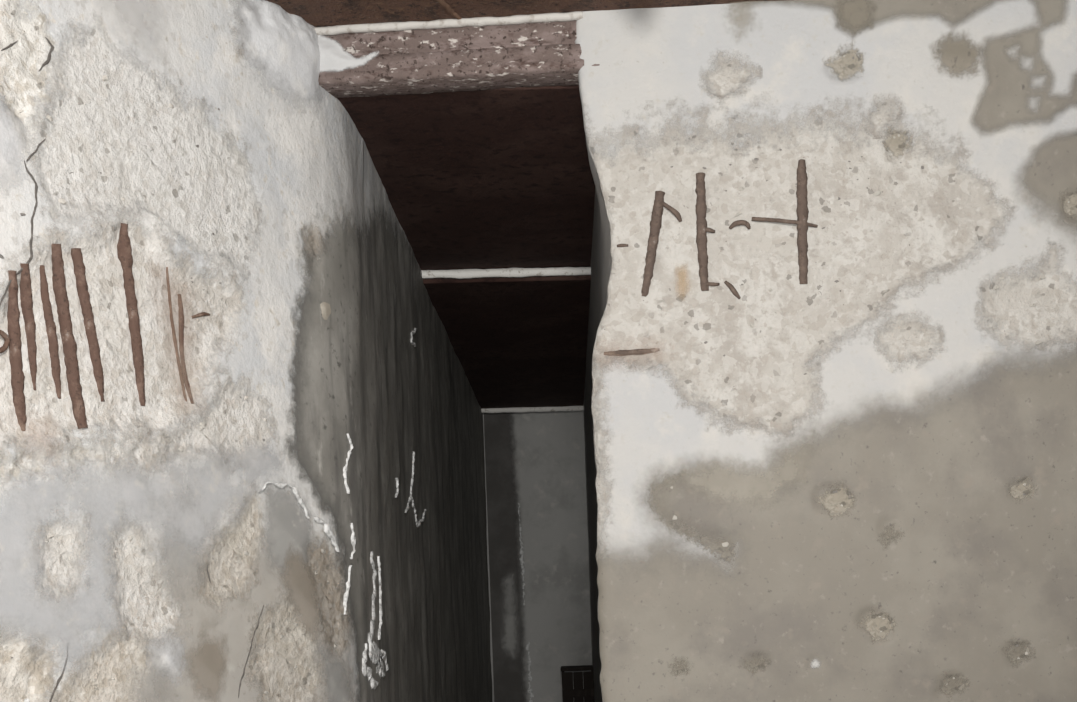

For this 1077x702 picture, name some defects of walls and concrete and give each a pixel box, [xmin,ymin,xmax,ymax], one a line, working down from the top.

crack [39,37,54,71]
damp [733,0,1077,132]
crack [0,138,46,305]
spalling [0,0,275,483]
spalling [585,99,1012,561]
spalling [977,244,1077,351]
damp [1023,132,1077,229]
crack [49,643,69,702]
spalling [195,487,265,611]
damp [0,206,534,702]
spalling [245,541,349,702]
damp [596,349,1077,702]